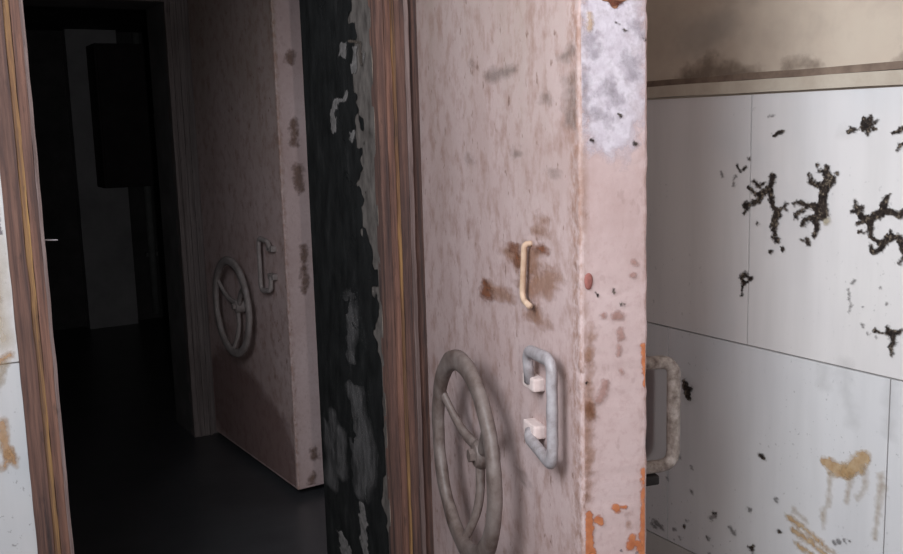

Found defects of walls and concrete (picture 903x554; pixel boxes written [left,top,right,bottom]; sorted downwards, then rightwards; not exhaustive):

peeling [581,0,647,156]
corrosion [0,420,16,468]
corrosion [820,451,870,479]
corrosion [585,511,604,554]
corrosion [787,515,827,554]